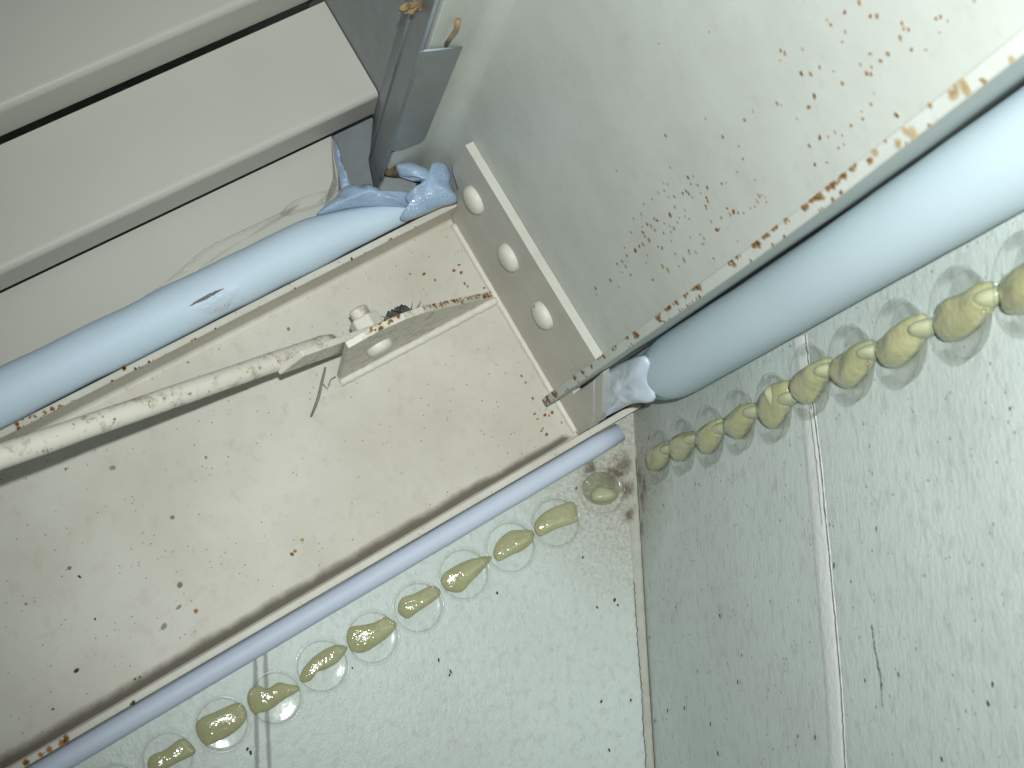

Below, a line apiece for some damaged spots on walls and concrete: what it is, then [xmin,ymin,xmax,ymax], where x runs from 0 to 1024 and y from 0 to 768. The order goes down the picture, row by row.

rust [949,79,970,100]
rust [801,112,917,212]
rust [616,176,767,276]
rust [728,217,790,267]
rust [655,283,702,323]
rust [532,331,639,436]